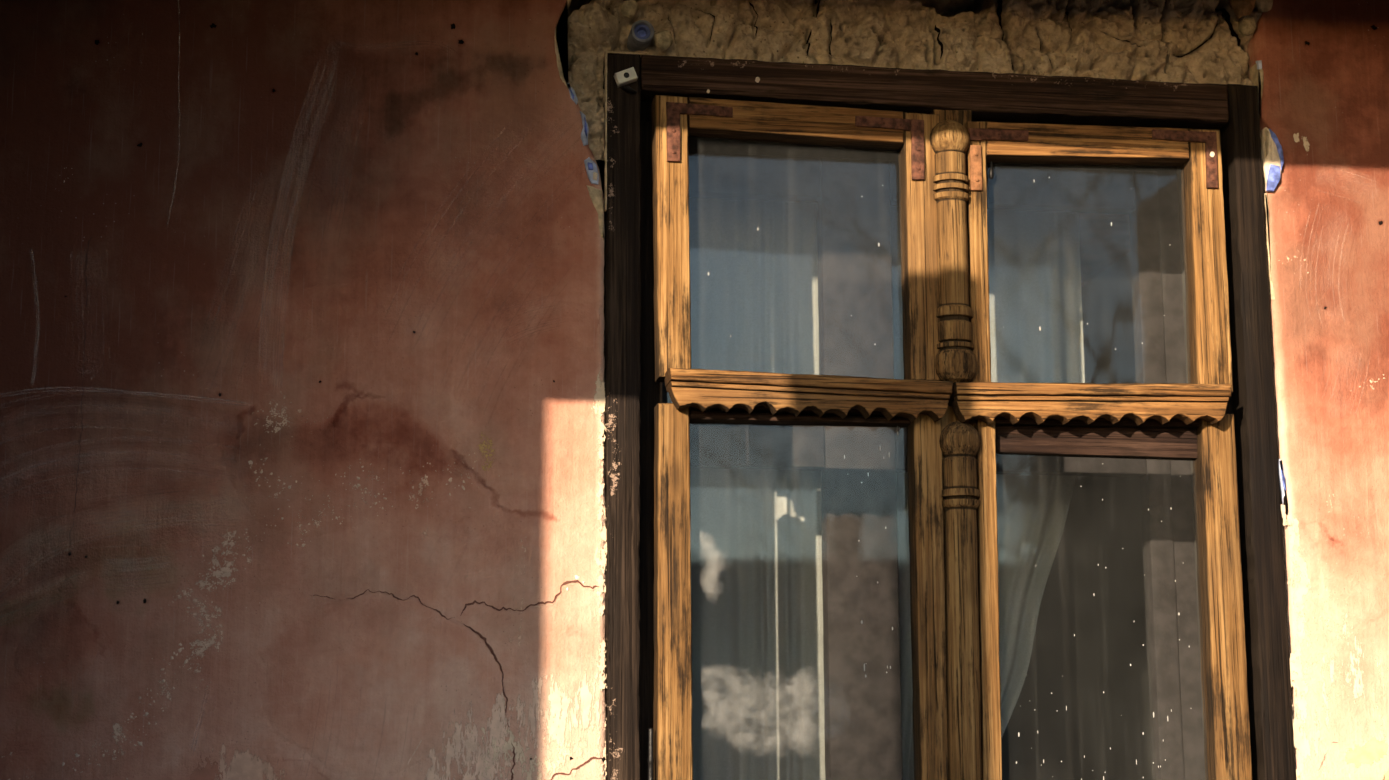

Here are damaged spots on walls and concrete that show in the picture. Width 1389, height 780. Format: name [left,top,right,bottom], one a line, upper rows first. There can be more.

spalling [555,0,605,240]
peeling [212,743,285,780]
water stain [62,391,500,780]
crack [313,575,606,780]
peeling [427,366,607,780]
peeling [1278,458,1389,780]